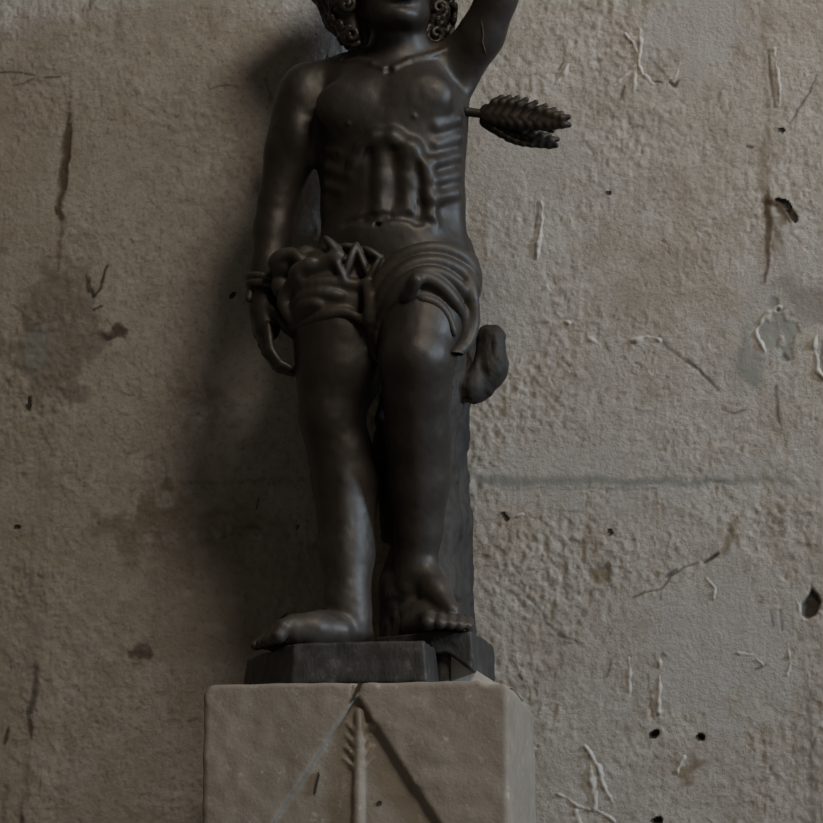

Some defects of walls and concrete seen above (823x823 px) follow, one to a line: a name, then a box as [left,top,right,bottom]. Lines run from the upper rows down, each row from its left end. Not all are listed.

spalling [753,300,797,360]
peeling [810,331,823,381]
spalling [794,585,820,622]